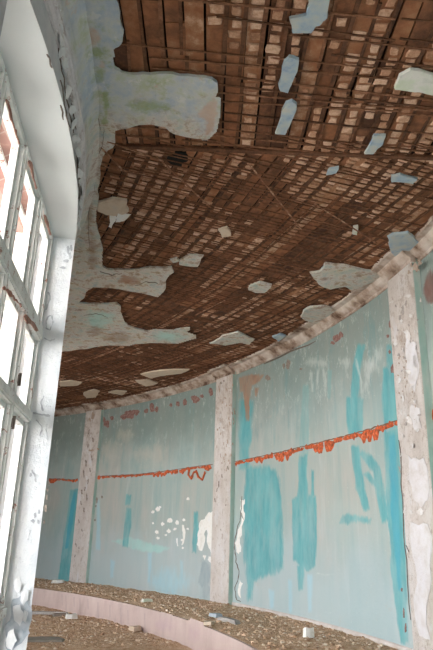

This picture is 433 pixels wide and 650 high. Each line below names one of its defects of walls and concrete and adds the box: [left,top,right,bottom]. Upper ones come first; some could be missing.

flaking render [85,0,124,49]
flaking render [93,58,221,210]
flaking render [59,85,180,352]
peeling [408,259,433,309]
flaking render [169,294,422,501]
peeling [152,518,189,549]
flaking render [197,512,212,563]
crack [234,497,244,602]
peeling [400,453,433,640]